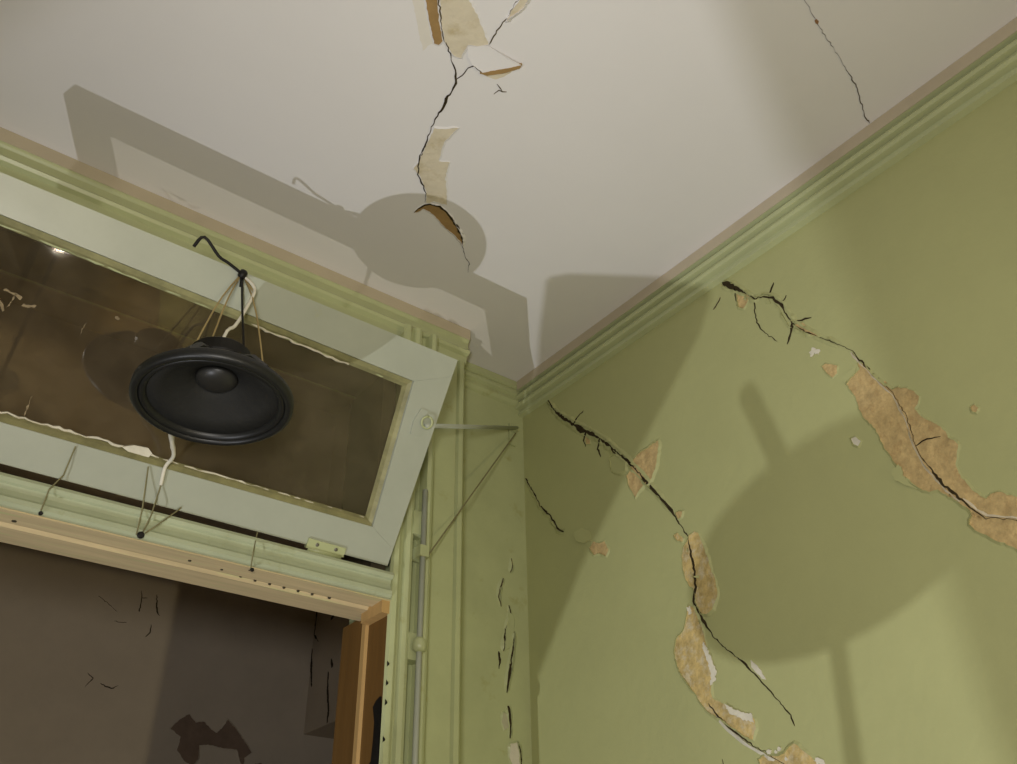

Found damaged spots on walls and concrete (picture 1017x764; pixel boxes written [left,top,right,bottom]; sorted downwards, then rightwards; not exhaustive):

peeling [412,0,522,79]
crack [489,1,518,44]
crack [804,0,870,123]
peeling [412,126,466,246]
crack [414,0,506,268]
crack [713,278,1017,521]
peeling [794,321,1017,552]
crack [547,400,795,726]
peeling [673,510,759,742]
peeling [169,714,252,764]
crack [708,703,784,764]
peeling [757,740,825,764]